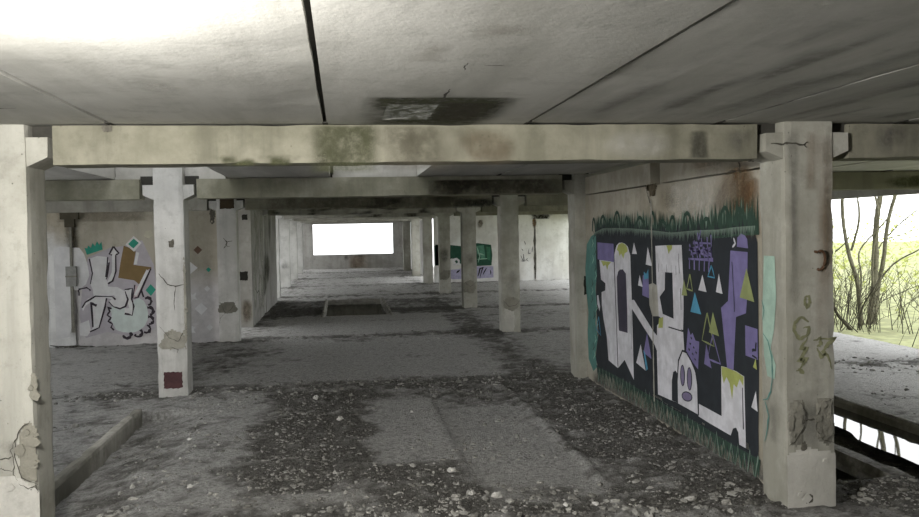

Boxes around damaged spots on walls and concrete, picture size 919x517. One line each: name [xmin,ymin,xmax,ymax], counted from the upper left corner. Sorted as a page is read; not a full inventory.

water stain [319,98,508,171]
crack [771,141,808,149]
spalling [158,257,189,353]
peeling [0,421,41,517]
peeling [787,398,836,509]